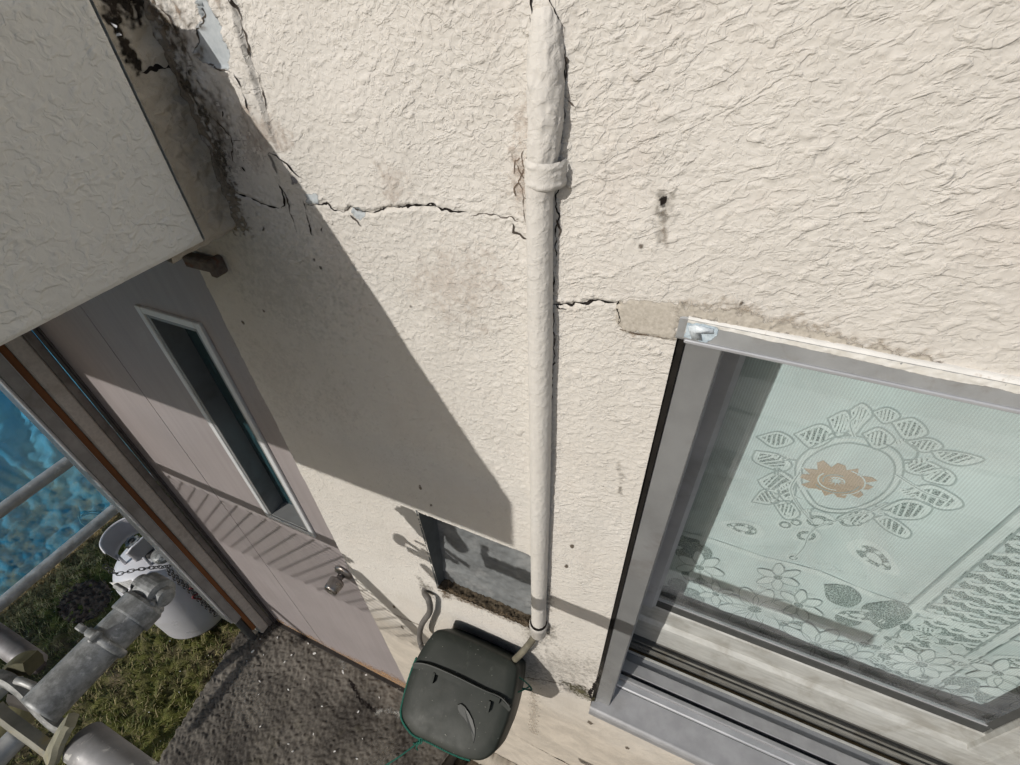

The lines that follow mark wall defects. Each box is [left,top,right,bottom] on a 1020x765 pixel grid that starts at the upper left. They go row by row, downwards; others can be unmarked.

crack [133,54,171,74]
damp [102,0,248,235]
peeling [193,0,230,70]
crack [154,0,526,239]
crack [529,0,582,141]
crack [552,190,676,398]